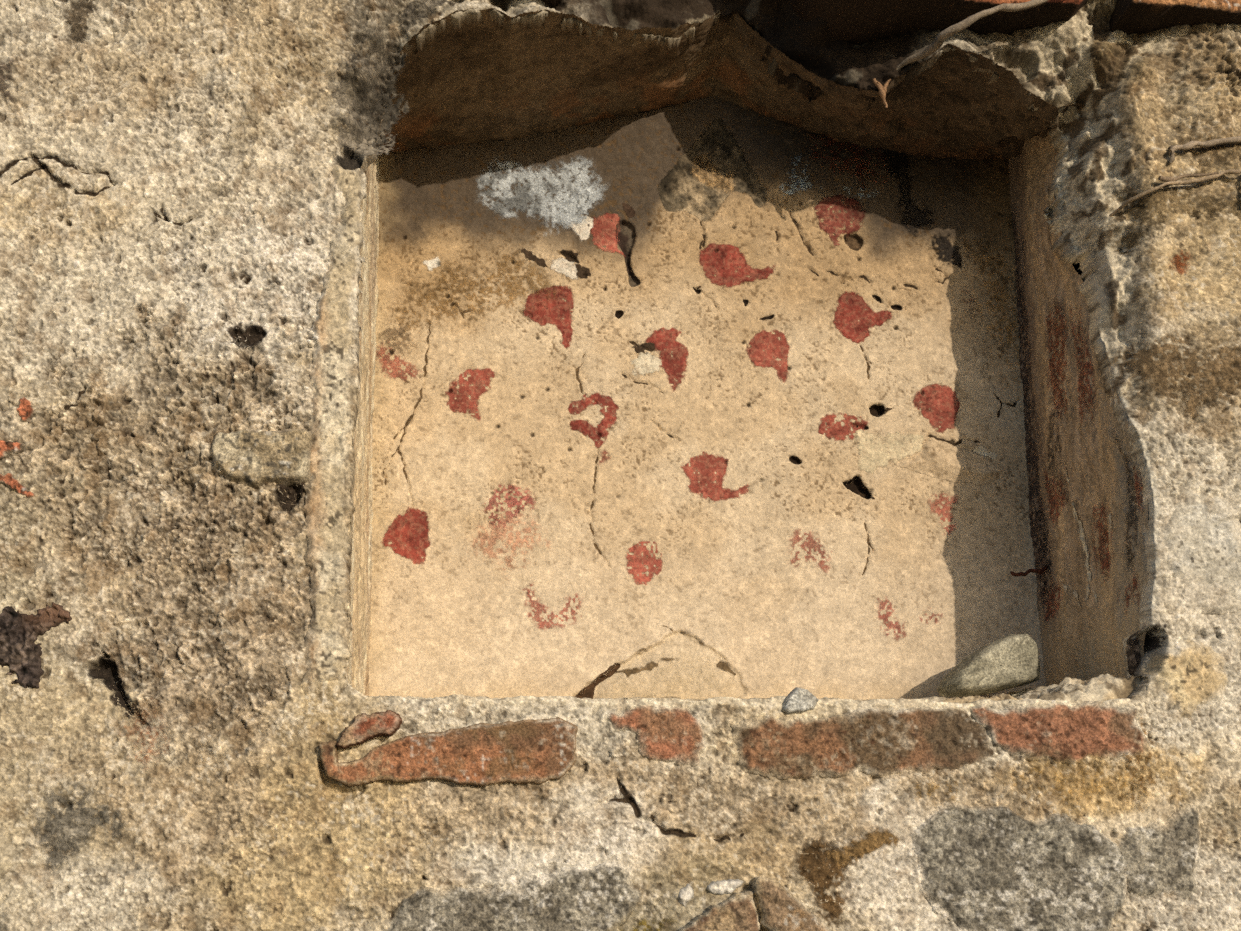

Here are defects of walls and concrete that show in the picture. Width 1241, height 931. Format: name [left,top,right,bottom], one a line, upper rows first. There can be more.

crack [0,155,115,196]
spalling [658,118,768,221]
spalling [423,257,440,271]
spalling [521,214,593,279]
spalling [616,203,640,287]
spalling [844,234,863,251]
crack [609,777,744,842]